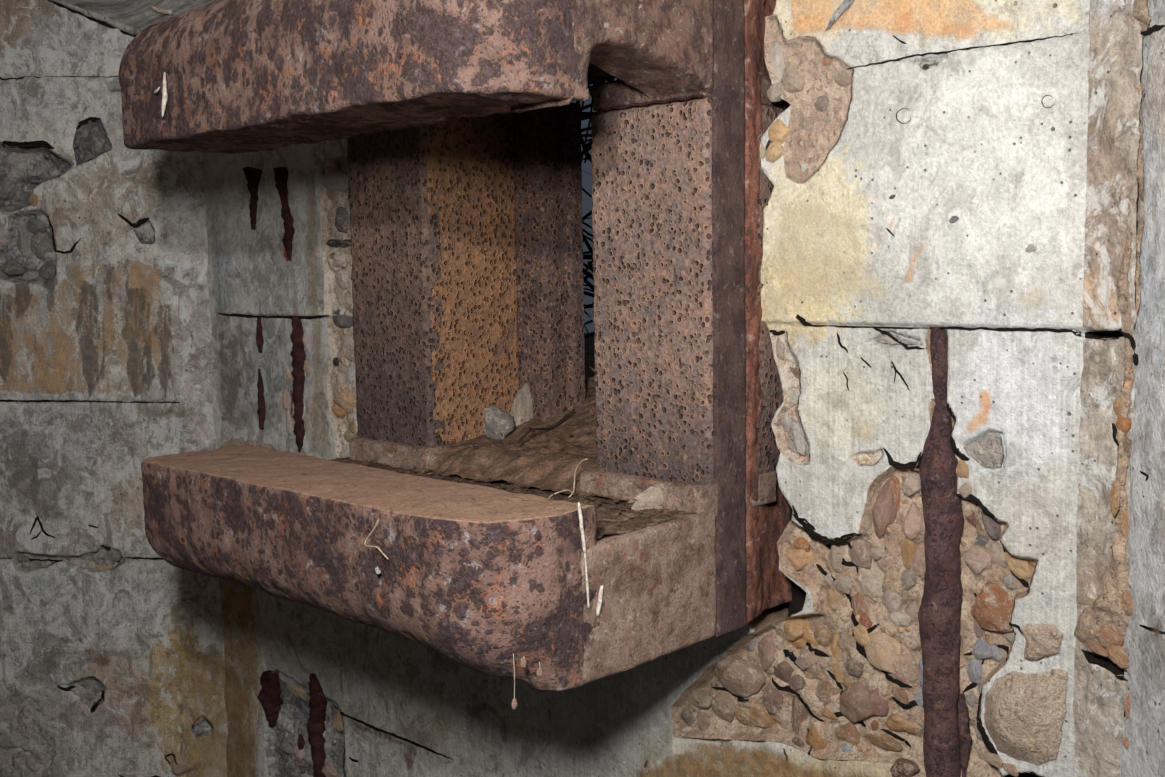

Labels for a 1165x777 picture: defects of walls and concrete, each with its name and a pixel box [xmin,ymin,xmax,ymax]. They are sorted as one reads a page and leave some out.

corrosion [789,0,1005,38]
crack [846,33,1076,70]
spalling [760,0,854,183]
spalling [0,119,112,285]
crack [769,314,1073,391]
crack [1119,329,1139,365]
spalling [670,327,1042,777]